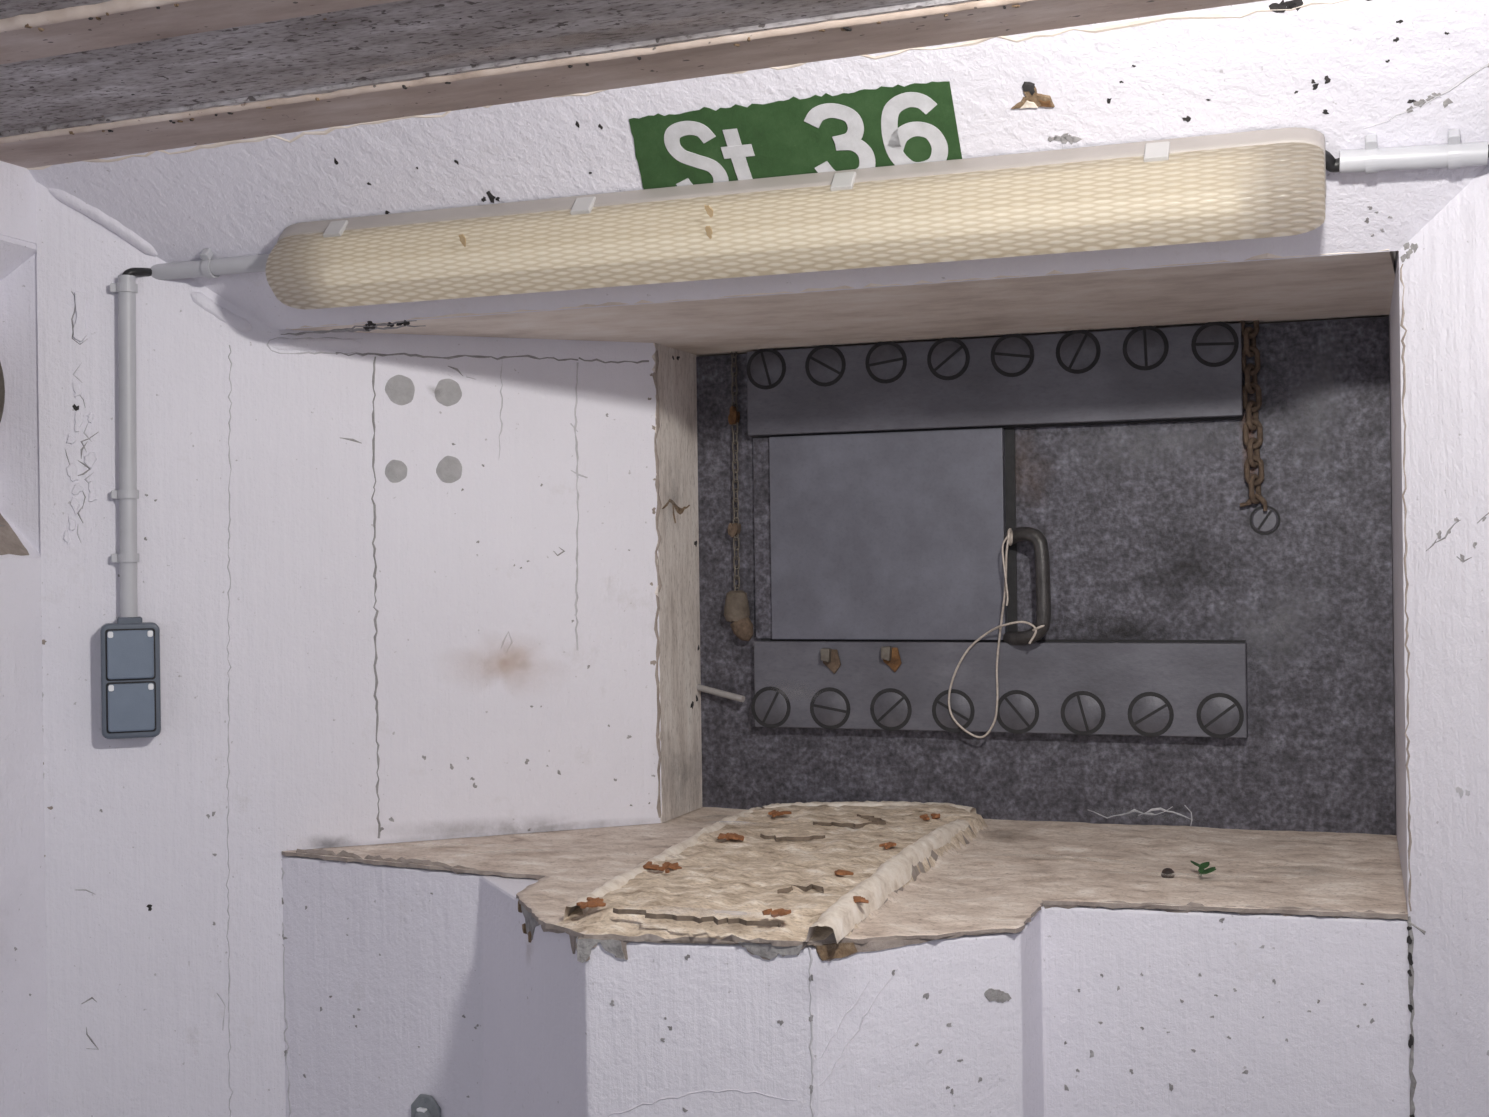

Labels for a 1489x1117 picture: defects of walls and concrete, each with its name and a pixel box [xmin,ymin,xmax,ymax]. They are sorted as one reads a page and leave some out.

corrosion [717,833,744,841]
corrosion [643,861,682,873]
corrosion [576,897,606,909]
corrosion [762,908,791,918]
spalling [518,900,1009,963]